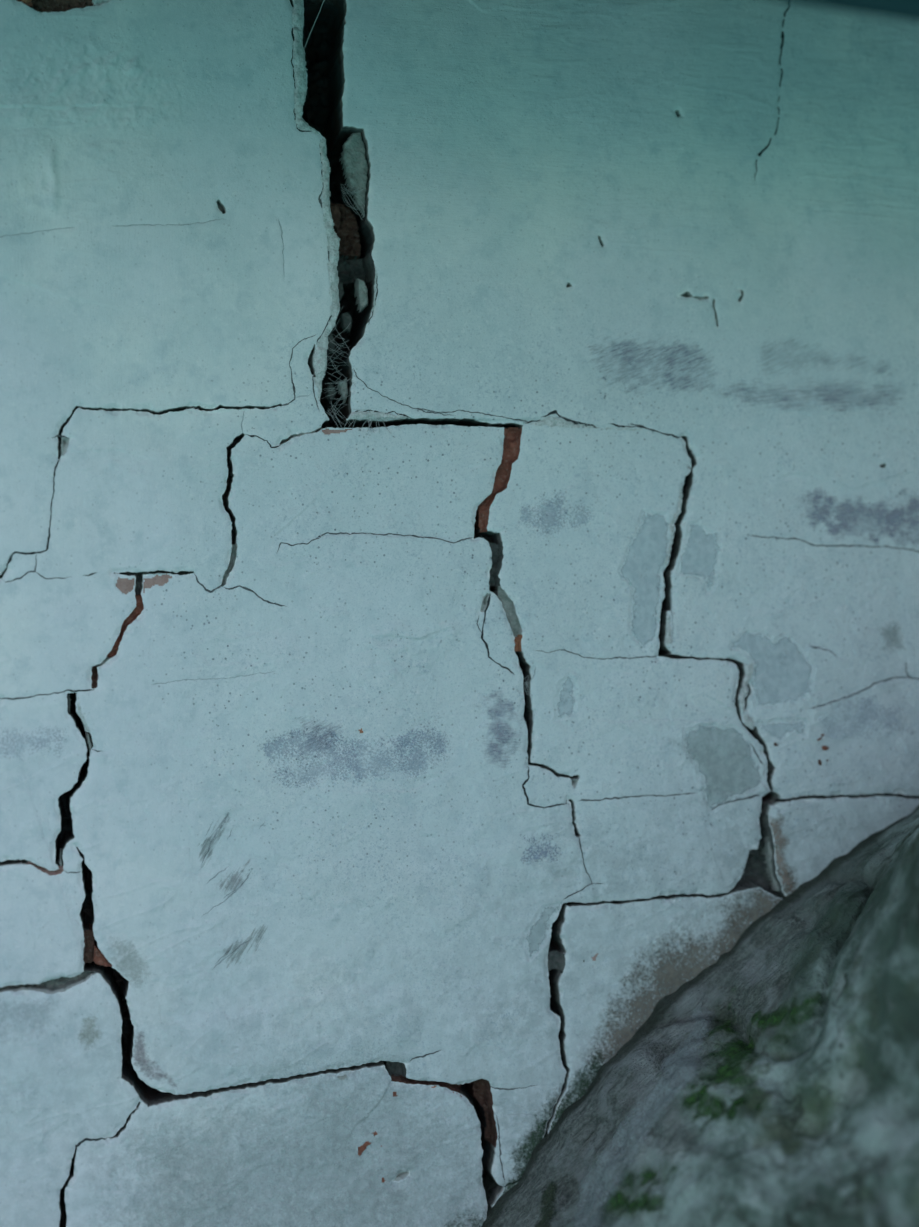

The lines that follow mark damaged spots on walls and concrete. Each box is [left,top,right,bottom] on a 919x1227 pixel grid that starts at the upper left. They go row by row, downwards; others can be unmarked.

crack [754,2,790,177]
crack [711,299,719,327]
crack [0,0,602,1207]
crack [406,405,775,791]
crack [580,793,693,801]
crack [700,789,759,810]
crack [546,890,732,1133]
crack [59,1102,140,1227]